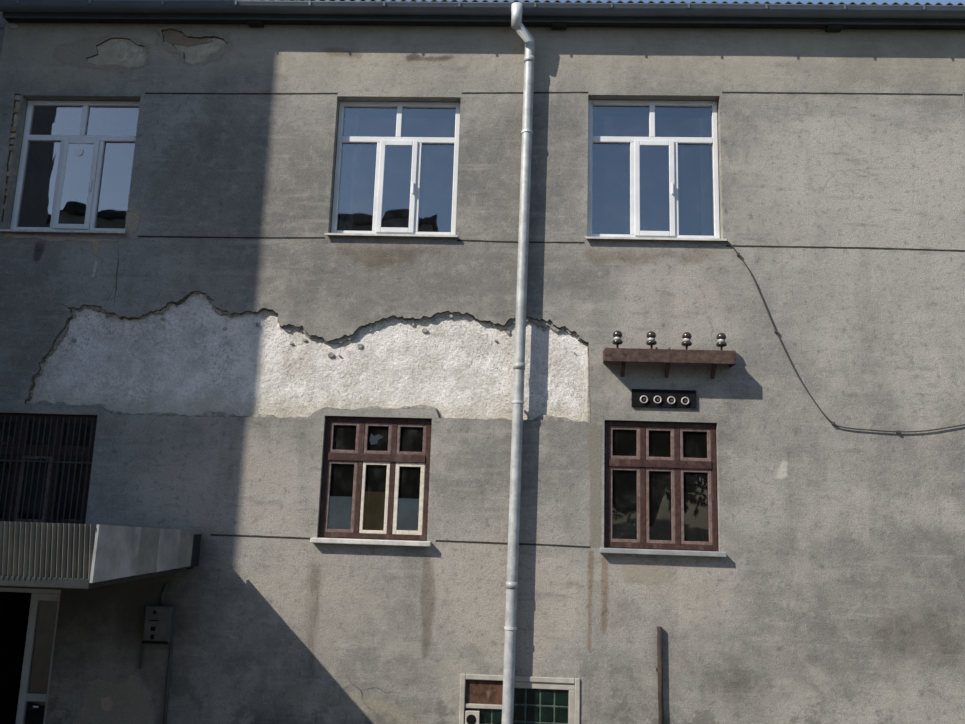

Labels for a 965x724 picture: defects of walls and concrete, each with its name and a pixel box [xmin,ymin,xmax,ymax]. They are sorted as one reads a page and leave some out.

flaking render [158,28,232,66]
flaking render [25,291,591,423]